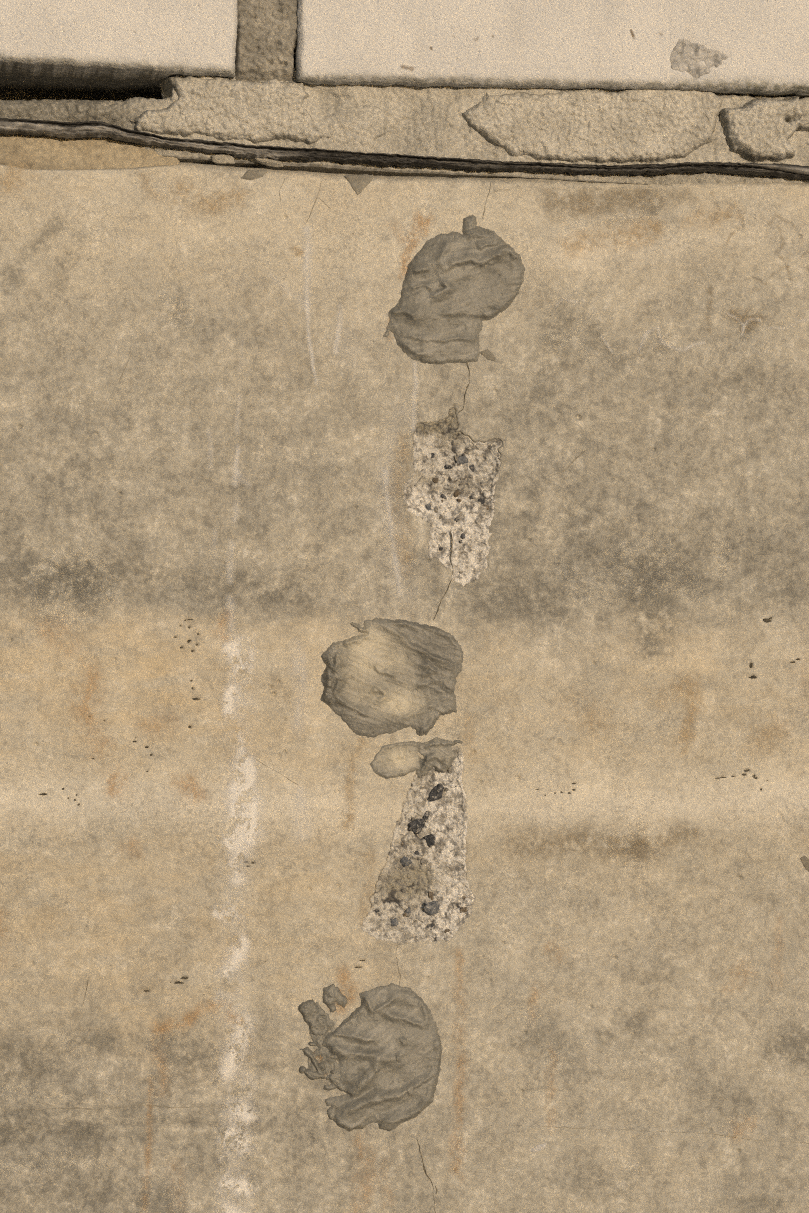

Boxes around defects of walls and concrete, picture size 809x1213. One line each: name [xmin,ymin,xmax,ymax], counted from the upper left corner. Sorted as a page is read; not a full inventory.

spalling [670,39,729,79]
spalling [0,134,179,170]
spalling [403,404,502,586]
efflorescence [222,640,254,717]
efflorescence [223,735,260,885]
spalling [360,746,475,945]
efflorescence [221,935,249,977]
efflorescence [220,1017,251,1078]
efflorescence [223,1101,255,1153]
efflorescence [219,1175,253,1213]